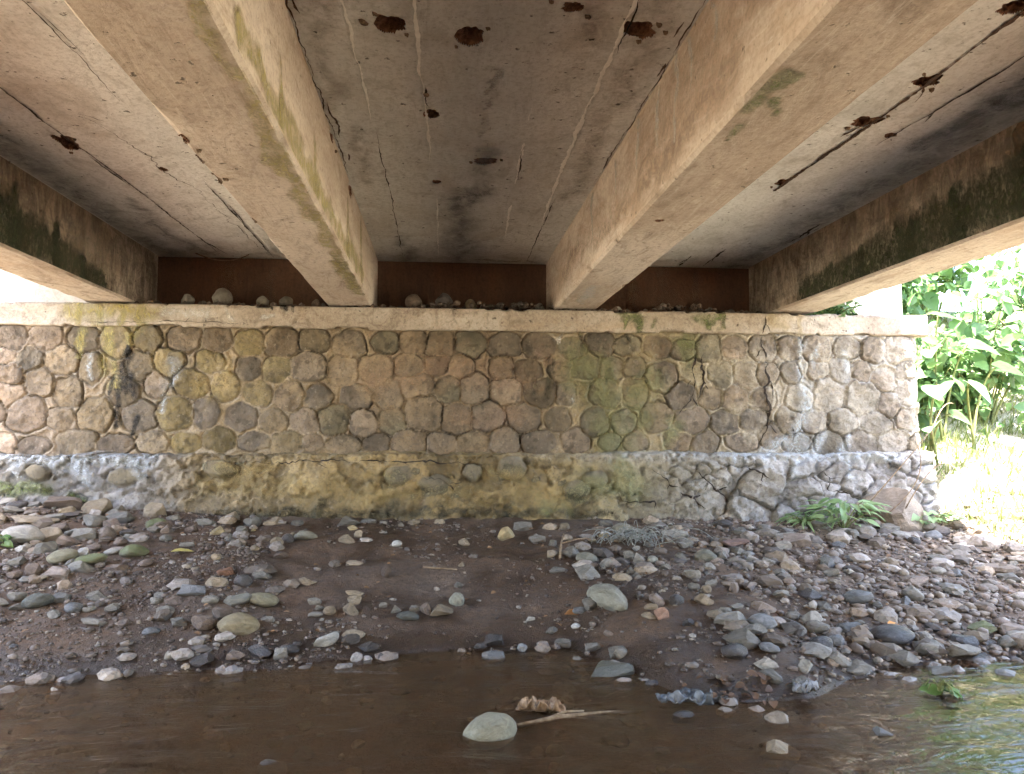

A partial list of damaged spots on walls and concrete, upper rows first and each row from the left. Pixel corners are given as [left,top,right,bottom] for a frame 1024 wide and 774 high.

crack [340,0,403,256]
leakage [6,182,24,251]
crack [0,87,223,252]
crack [80,114,268,254]
leakage [902,217,917,261]
leakage [948,181,966,244]
crack [677,336,708,416]